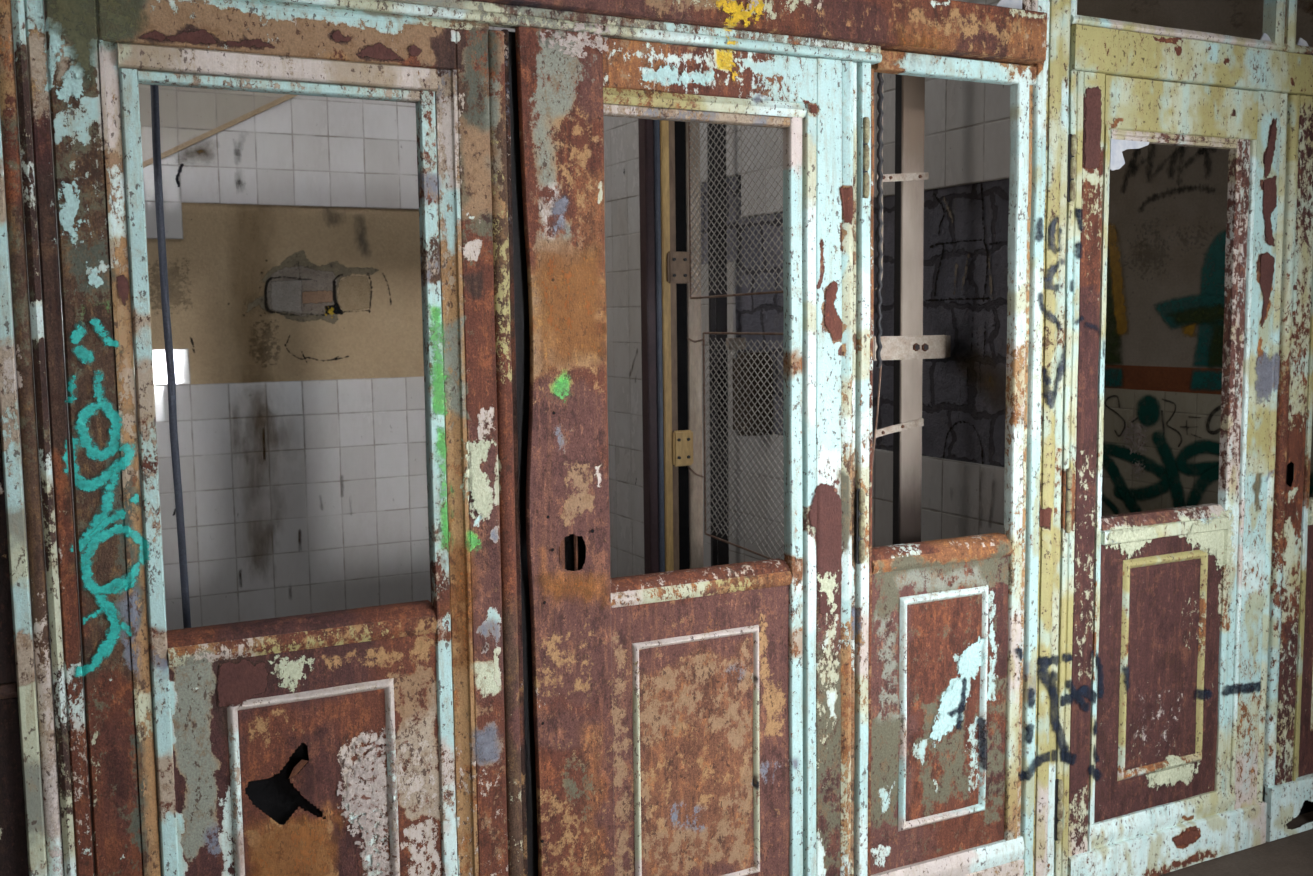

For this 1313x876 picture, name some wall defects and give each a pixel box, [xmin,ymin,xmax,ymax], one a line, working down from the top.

peeling [41,21,91,112]
corrosion [139,29,277,49]
corrosion [1084,87,1102,169]
peeling [58,181,86,244]
corrosion [1260,118,1277,327]
peeling [86,261,104,288]
flaking render [246,250,379,324]
corrosion [810,484,843,615]
peeling [930,635,987,748]
peeling [337,728,399,876]